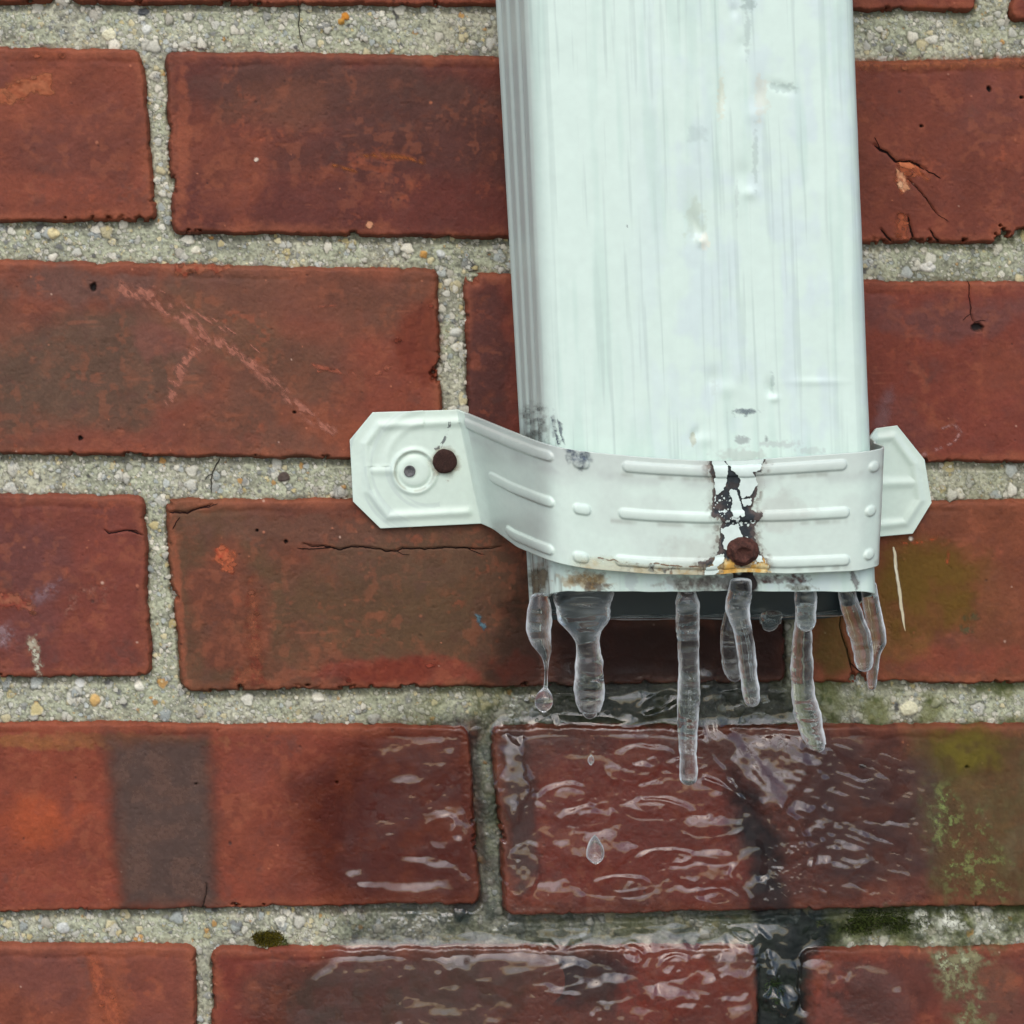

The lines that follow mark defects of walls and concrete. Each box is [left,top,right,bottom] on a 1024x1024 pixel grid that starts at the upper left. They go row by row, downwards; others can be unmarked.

crack [874,137,949,242]
crack [963,281,985,322]
peeling [698,459,770,575]
crack [298,544,495,555]
rust [571,534,768,589]
damp [542,687,584,720]
damp [597,686,678,723]
damp [699,686,784,723]
damp [815,749,927,892]
damp [733,787,788,912]
damp [551,955,628,999]
damp [755,911,843,1024]